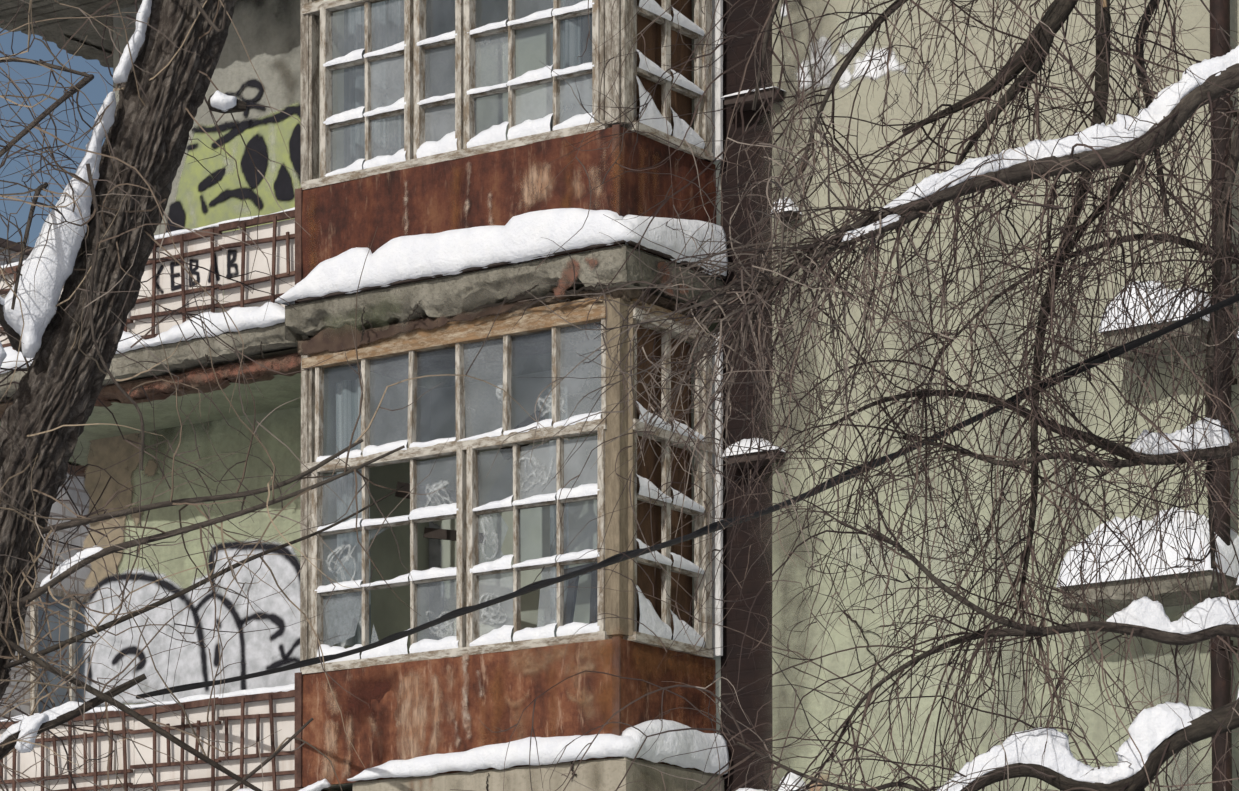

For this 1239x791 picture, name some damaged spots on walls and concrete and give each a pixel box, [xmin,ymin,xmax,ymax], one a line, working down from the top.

corrosion [345,674,395,722]